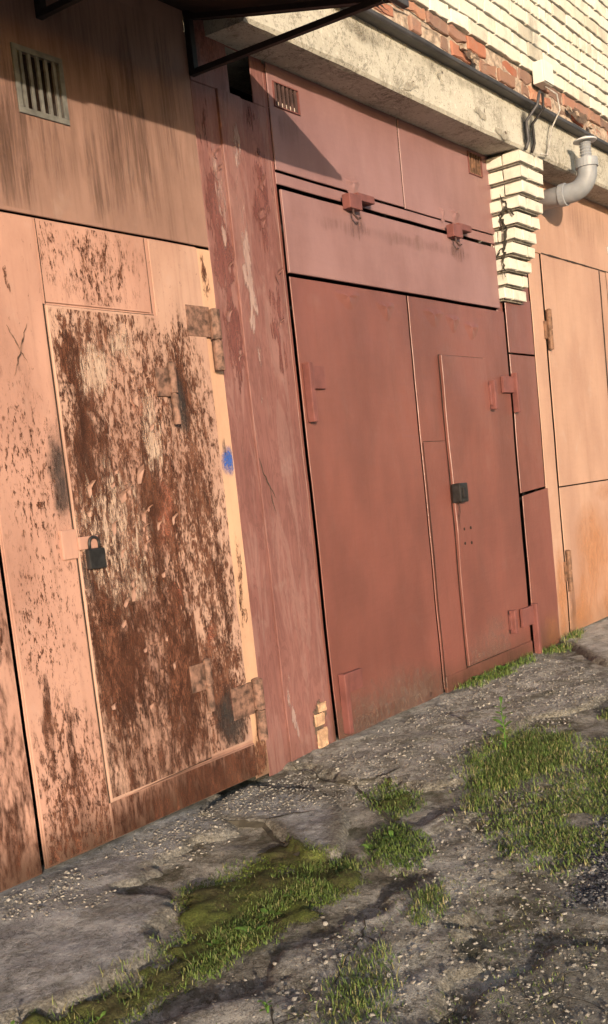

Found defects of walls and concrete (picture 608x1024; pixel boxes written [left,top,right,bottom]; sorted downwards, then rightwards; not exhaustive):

corrosion [38,223,133,307]
corrosion [0,315,267,889]
crack [203,810,328,866]
crack [293,765,424,841]
crack [501,967,608,1024]